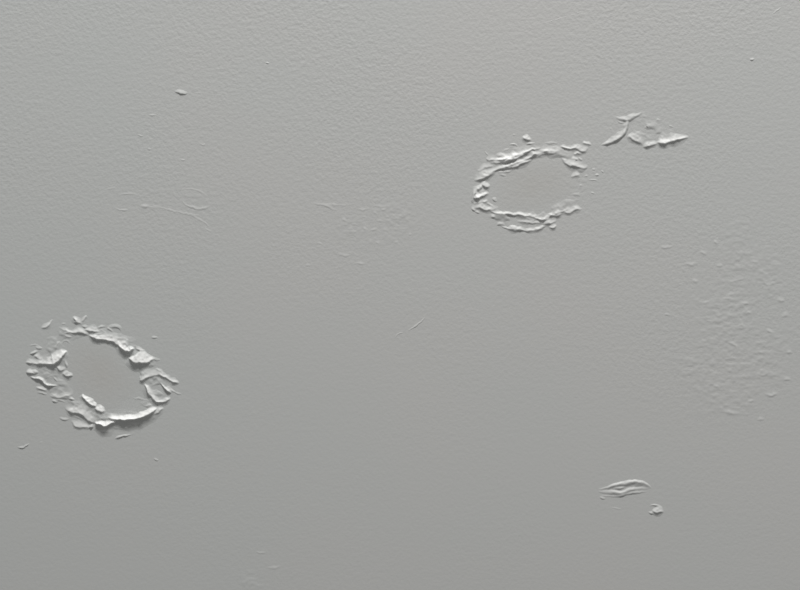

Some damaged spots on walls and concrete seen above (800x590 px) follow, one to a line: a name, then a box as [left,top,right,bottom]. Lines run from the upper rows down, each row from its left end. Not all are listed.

peeling [471,134,604,234]
peeling [25,315,182,439]